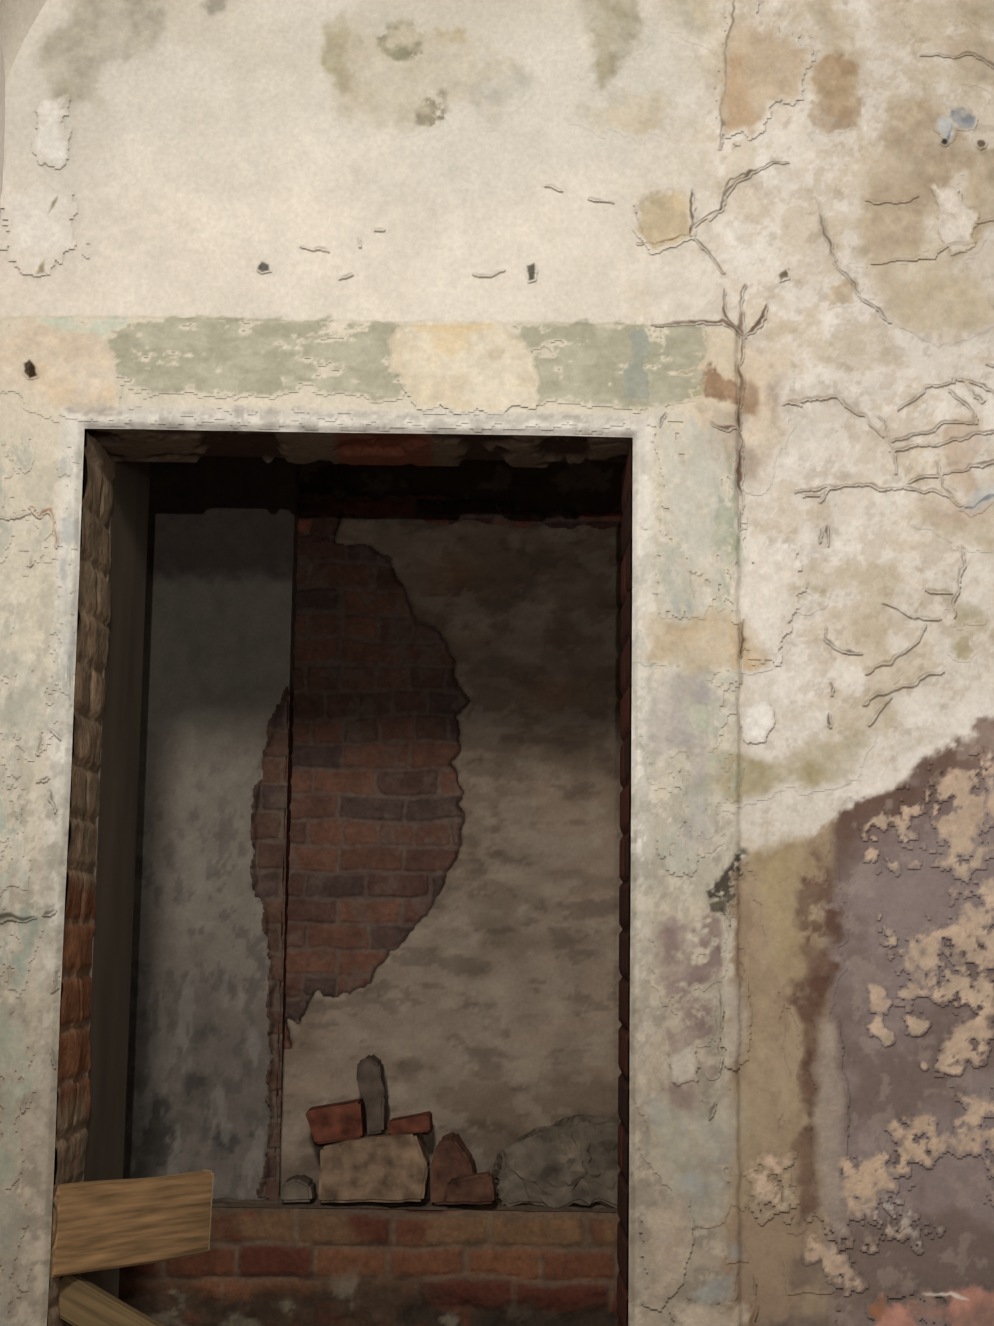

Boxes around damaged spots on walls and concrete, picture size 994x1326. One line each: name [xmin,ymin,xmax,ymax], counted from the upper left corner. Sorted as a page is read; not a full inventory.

leakage [22,0,172,117]
leakage [196,0,246,28]
crack [650,0,789,530]
crack [813,196,892,323]
crack [782,361,994,546]
peeling [37,311,808,876]
crack [738,618,748,657]
crack [822,624,862,727]
flaking render [249,492,623,1200]
flaking render [669,1045,700,1086]
peeling [743,738,994,1326]
flaking render [638,1194,751,1326]